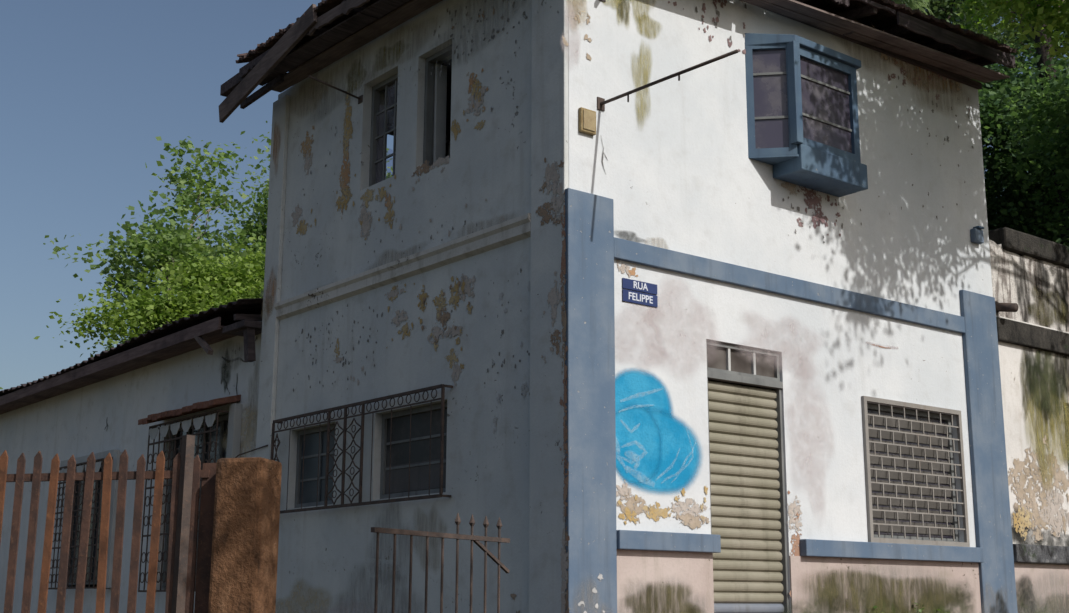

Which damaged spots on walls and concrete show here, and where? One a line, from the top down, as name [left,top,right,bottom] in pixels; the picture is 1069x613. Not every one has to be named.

water stain [612,0,656,37]
peeling [451,68,492,141]
water stain [636,51,650,117]
peeling [325,92,405,262]
water stain [1015,256,1067,325]
peeling [295,274,476,388]
peeling [484,158,605,613]
water stain [1021,348,1069,473]
peeling [616,480,711,529]
water stain [1011,511,1069,547]
mould [627,586,696,613]
water stain [804,572,970,613]